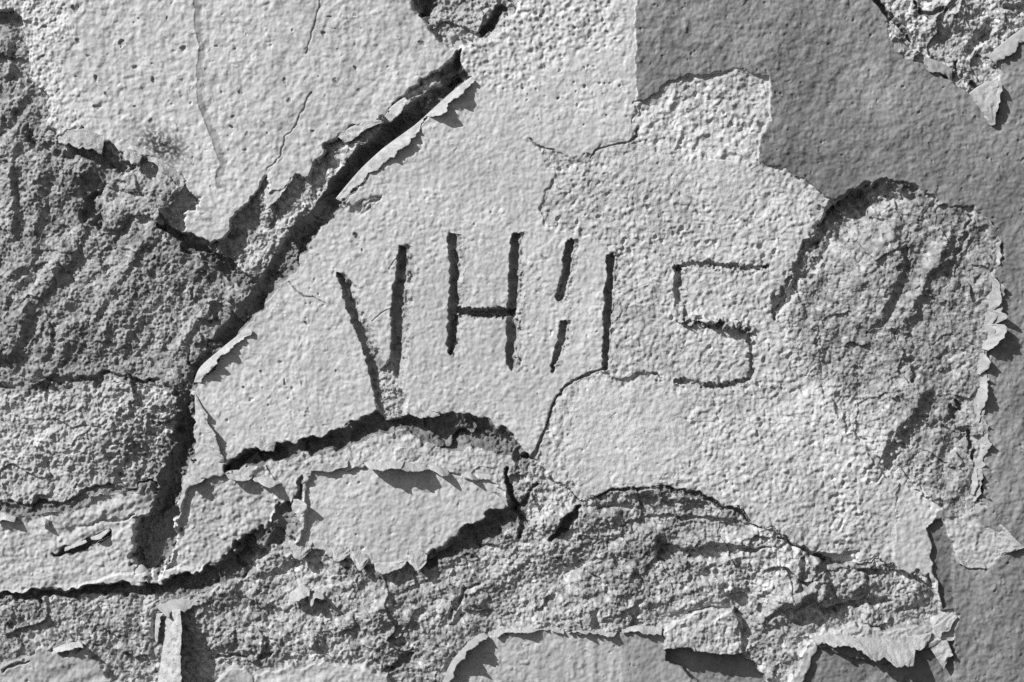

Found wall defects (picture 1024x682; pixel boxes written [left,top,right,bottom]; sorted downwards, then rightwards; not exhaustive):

spalling [0,9,389,386]
crack [193,0,228,190]
crack [305,0,322,54]
crack [590,128,639,159]
spalling [873,0,1024,126]
crack [133,48,604,595]
spalling [774,178,1008,518]
spalling [0,458,958,682]